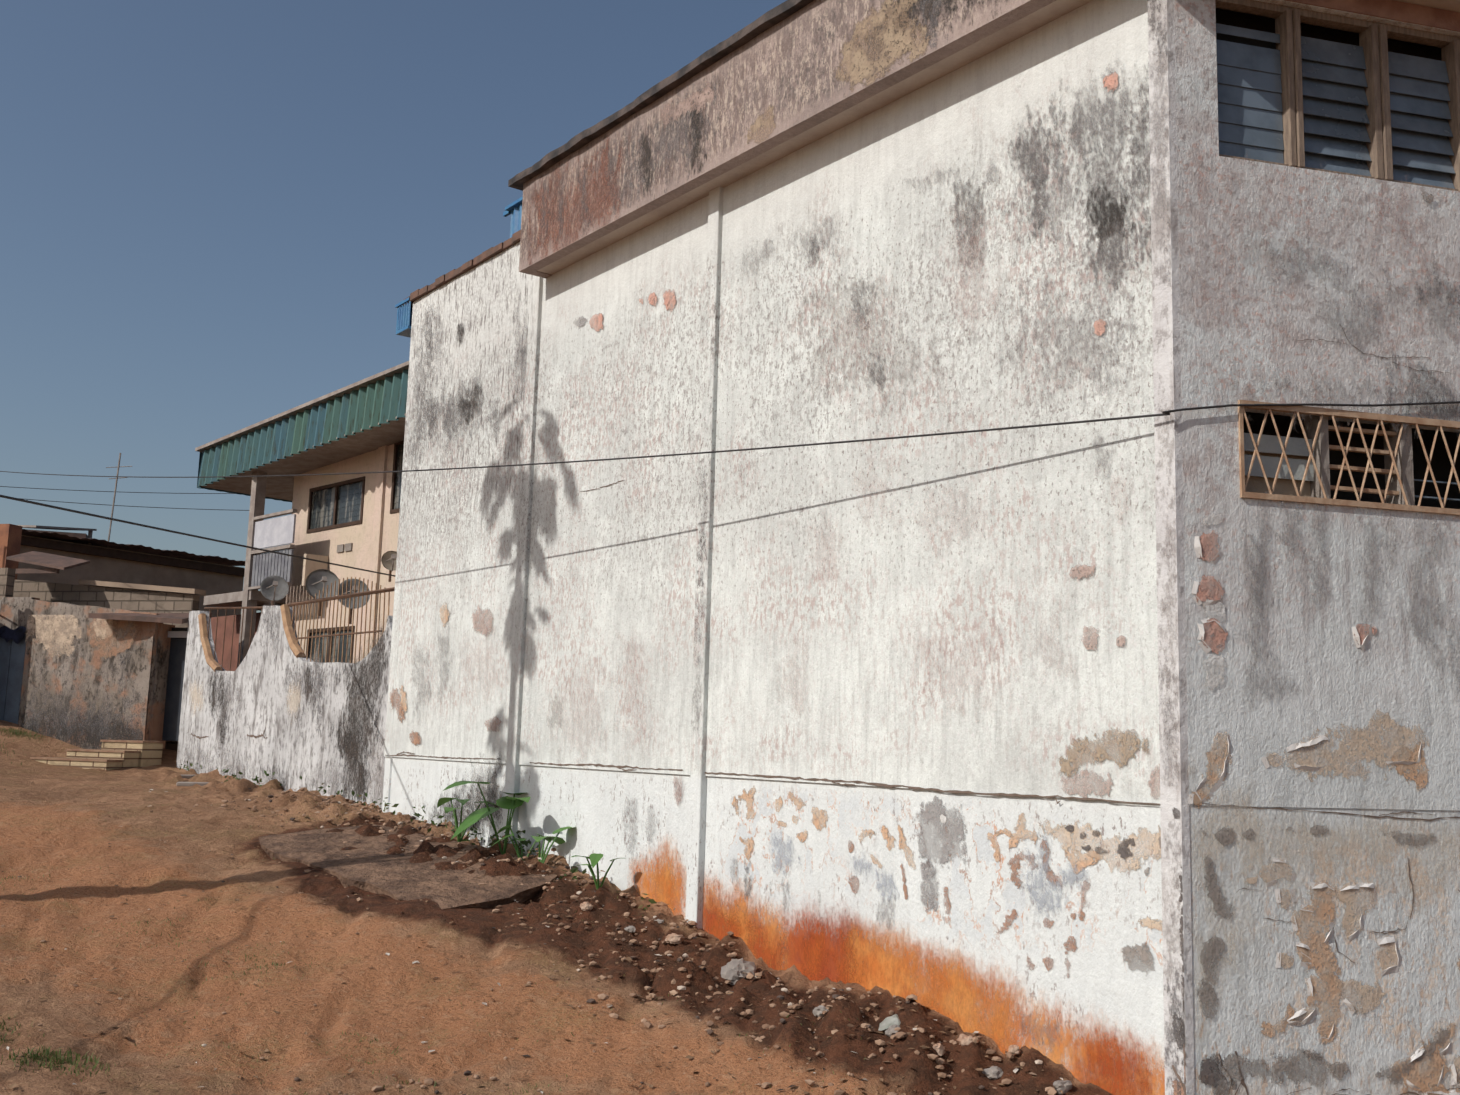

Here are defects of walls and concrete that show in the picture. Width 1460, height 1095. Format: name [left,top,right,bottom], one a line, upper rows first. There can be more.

leakage [856,0,1006,79]
leakage [1004,0,1167,289]
leakage [19,636,146,749]
leakage [285,621,391,802]
peeling [1261,712,1430,791]
corrosion [633,851,685,918]
spalling [848,796,967,912]
peeling [987,728,1232,978]
corrosion [702,884,1165,1095]
peeling [1122,858,1402,1095]
crack [1172,1046,1249,1095]
crack [1287,1087,1460,1095]